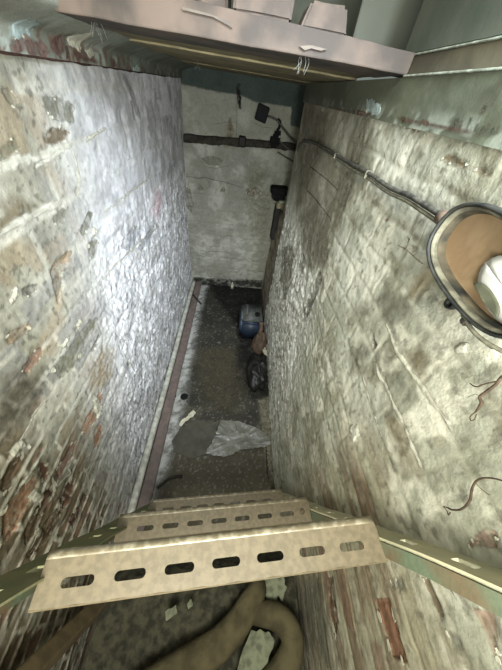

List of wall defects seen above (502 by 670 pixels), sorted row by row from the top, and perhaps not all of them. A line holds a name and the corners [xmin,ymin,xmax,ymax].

peeling [67,32,94,59]
peeling [0,95,75,173]
corrosion [401,117,470,133]
peeling [0,201,66,236]
flaking render [80,212,99,260]
flaking render [9,284,37,305]
flaking render [50,251,72,300]
flaking render [5,324,31,345]
flaking render [51,318,100,378]
spalling [1,391,103,559]